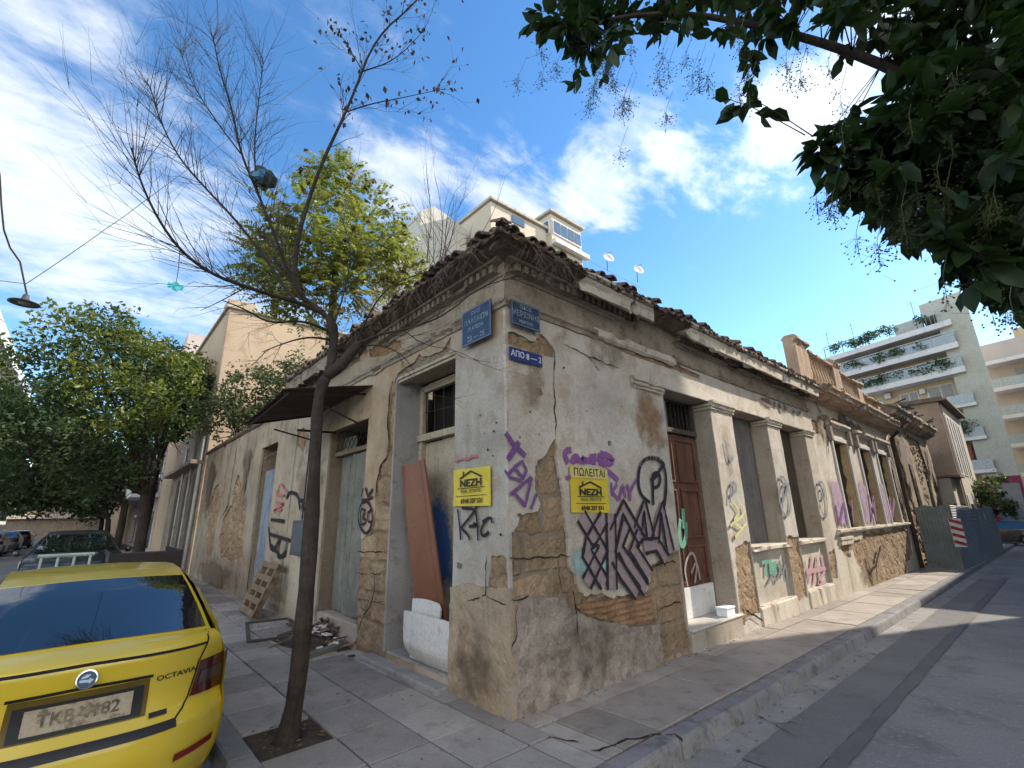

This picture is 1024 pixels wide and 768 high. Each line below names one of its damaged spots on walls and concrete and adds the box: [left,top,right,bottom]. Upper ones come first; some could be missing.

spalling [508,332,553,358]
crack [552,344,618,437]
spalling [207,477,245,561]
spalling [356,340,451,658]
crack [468,554,581,649]
spalling [489,440,690,663]
spalling [735,541,762,625]
spalling [786,535,807,601]
spalling [892,462,928,567]